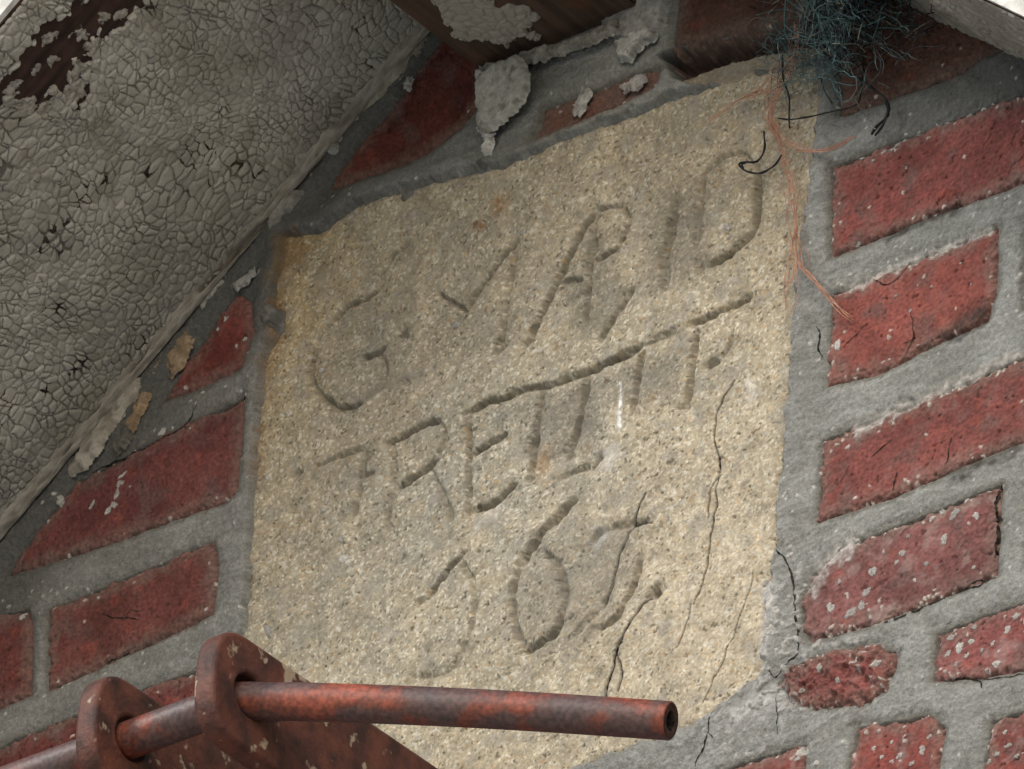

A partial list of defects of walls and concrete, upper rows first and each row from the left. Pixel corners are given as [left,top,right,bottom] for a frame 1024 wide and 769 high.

peeling [0,0,159,129]
peeling [431,0,621,157]
crack [92,405,197,473]
crack [607,506,652,601]
crack [606,603,646,697]
crack [767,544,800,730]